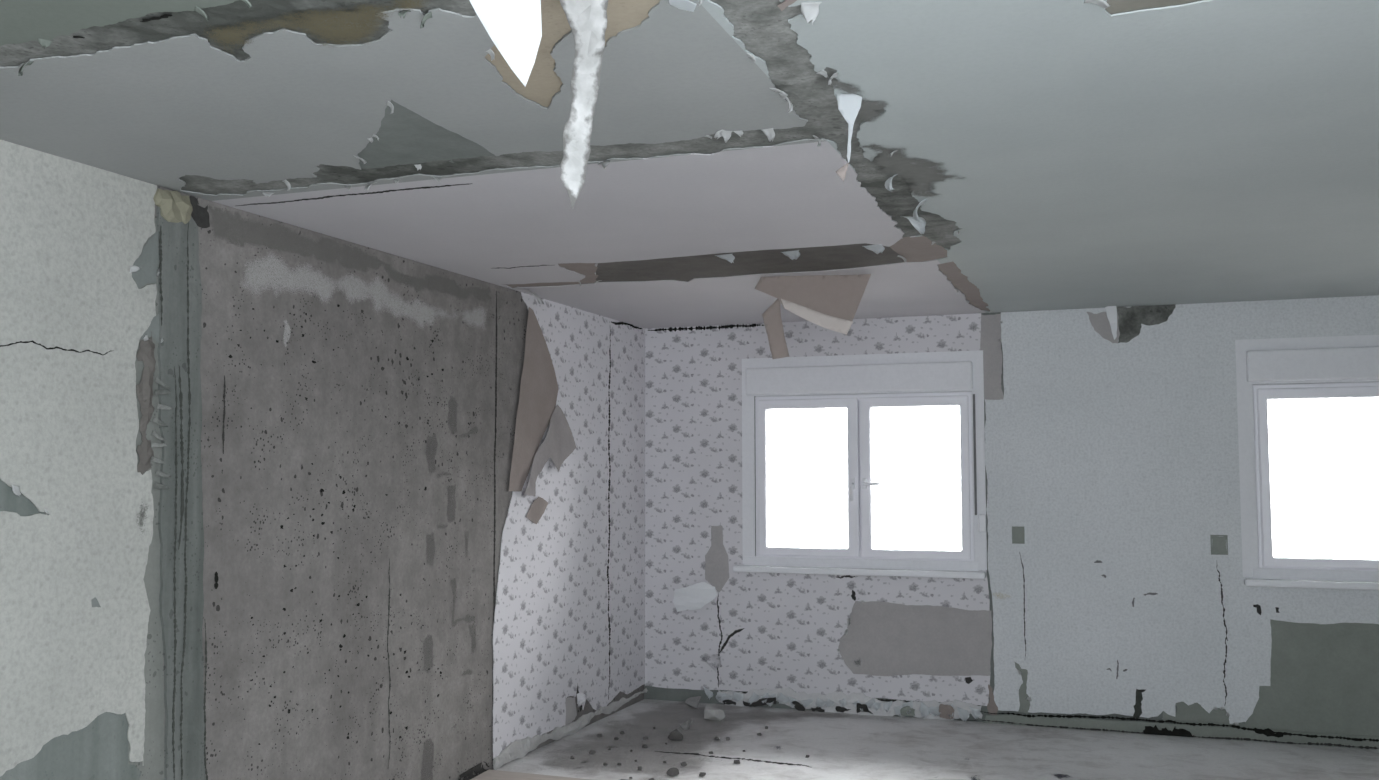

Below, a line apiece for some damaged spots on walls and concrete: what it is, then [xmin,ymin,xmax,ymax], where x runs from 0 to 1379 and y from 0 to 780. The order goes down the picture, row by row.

peeling [485,0,571,107]
peeling [605,0,660,45]
peeling [801,2,821,25]
peeling [1084,0,1198,14]
crack [0,340,110,355]
peeling [1087,304,1176,343]
peeling [0,218,172,780]
peeling [705,526,729,592]
peeling [837,600,992,684]
crack [1018,552,1026,657]
crack [957,570,1379,749]
peeling [1143,604,1379,737]